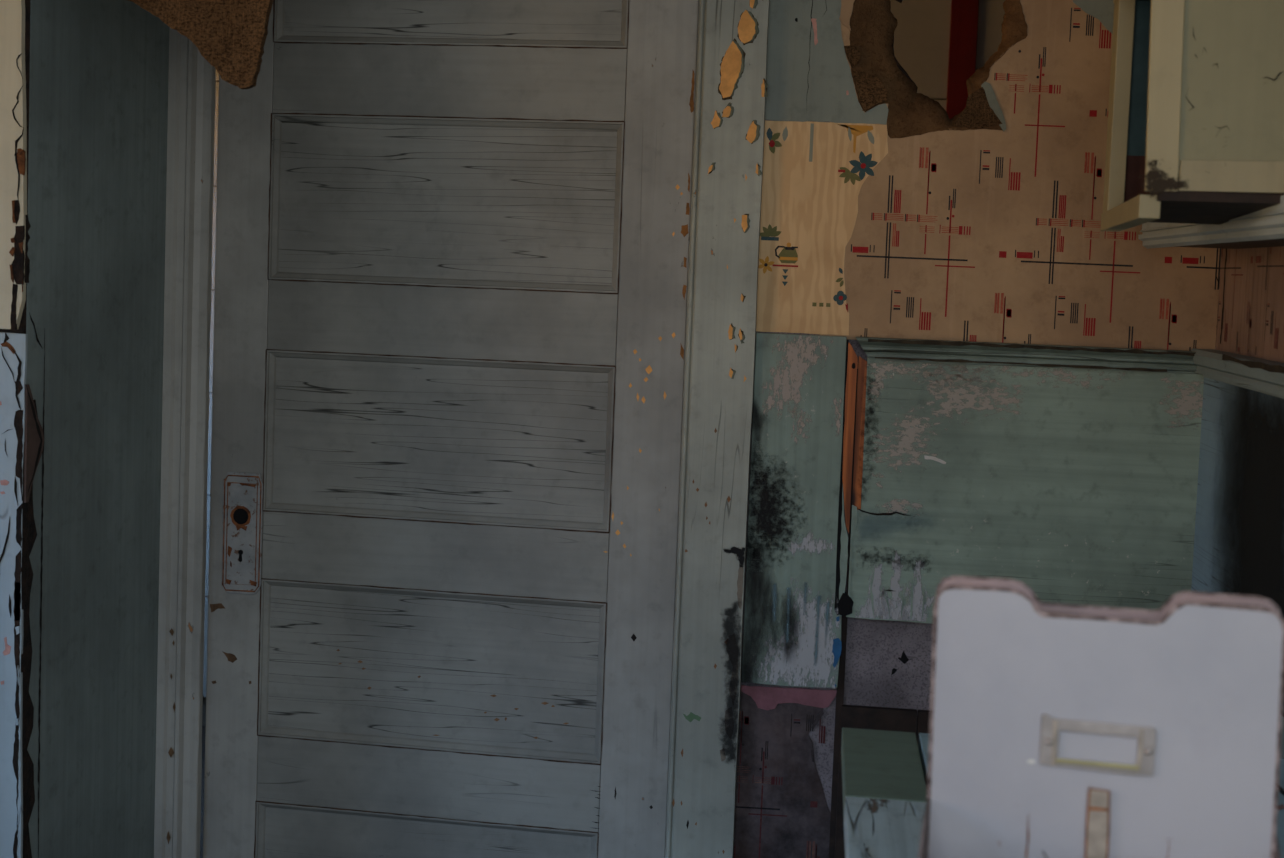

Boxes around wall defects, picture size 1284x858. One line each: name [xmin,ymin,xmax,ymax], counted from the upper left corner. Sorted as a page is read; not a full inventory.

peeling [711,0,759,129]
spalling [839,0,1027,138]
peeling [745,120,761,144]
peeling [672,173,690,237]
peeling [734,214,750,233]
peeling [728,323,745,352]
peeling [762,335,833,443]
spalling [0,313,45,858]
damp [741,403,835,683]